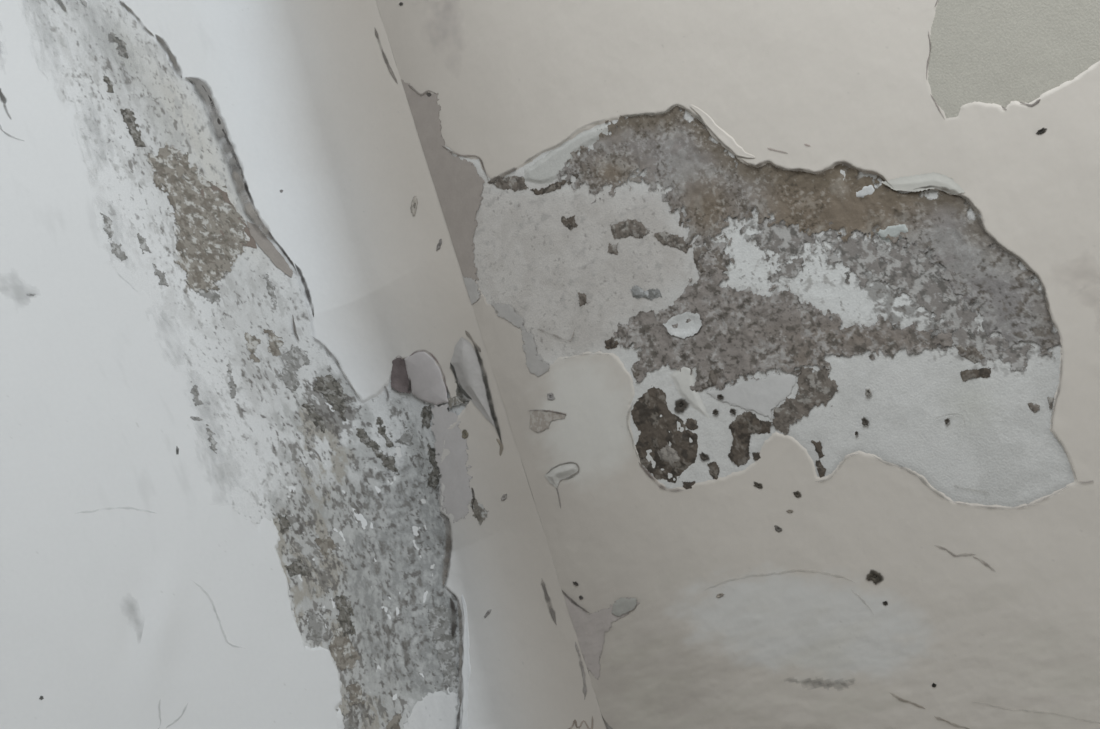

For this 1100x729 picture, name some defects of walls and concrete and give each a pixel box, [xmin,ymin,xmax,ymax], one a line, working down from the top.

flaking render [24,0,503,729]
flaking render [382,51,1074,508]
peeling [926,0,1100,118]